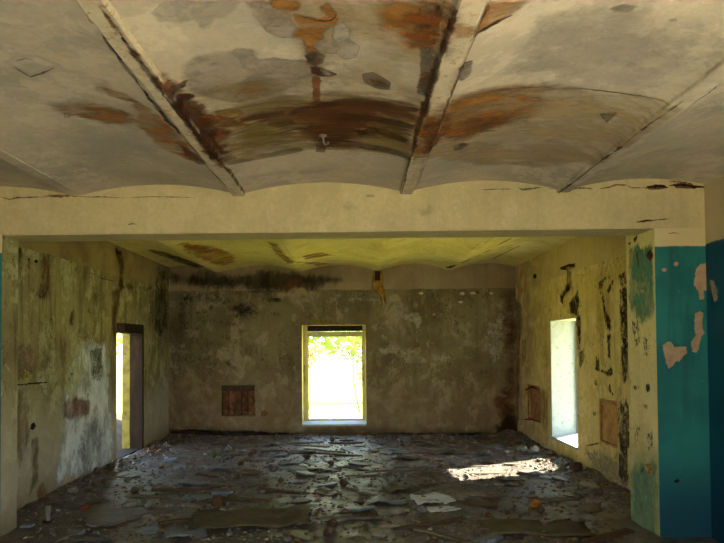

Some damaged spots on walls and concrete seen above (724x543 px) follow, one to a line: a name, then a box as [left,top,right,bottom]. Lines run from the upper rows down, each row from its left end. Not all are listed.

corrosion [103,11,147,68]
corrosion [61,72,248,194]
corrosion [271,0,338,108]
peeling [362,72,391,90]
corrosion [379,1,458,194]
crack [2,193,190,201]
leakage [188,271,337,302]
mould [560,286,584,366]
mould [595,271,650,384]
peeling [662,310,706,370]
peeling [692,262,719,303]
mould [617,399,640,486]